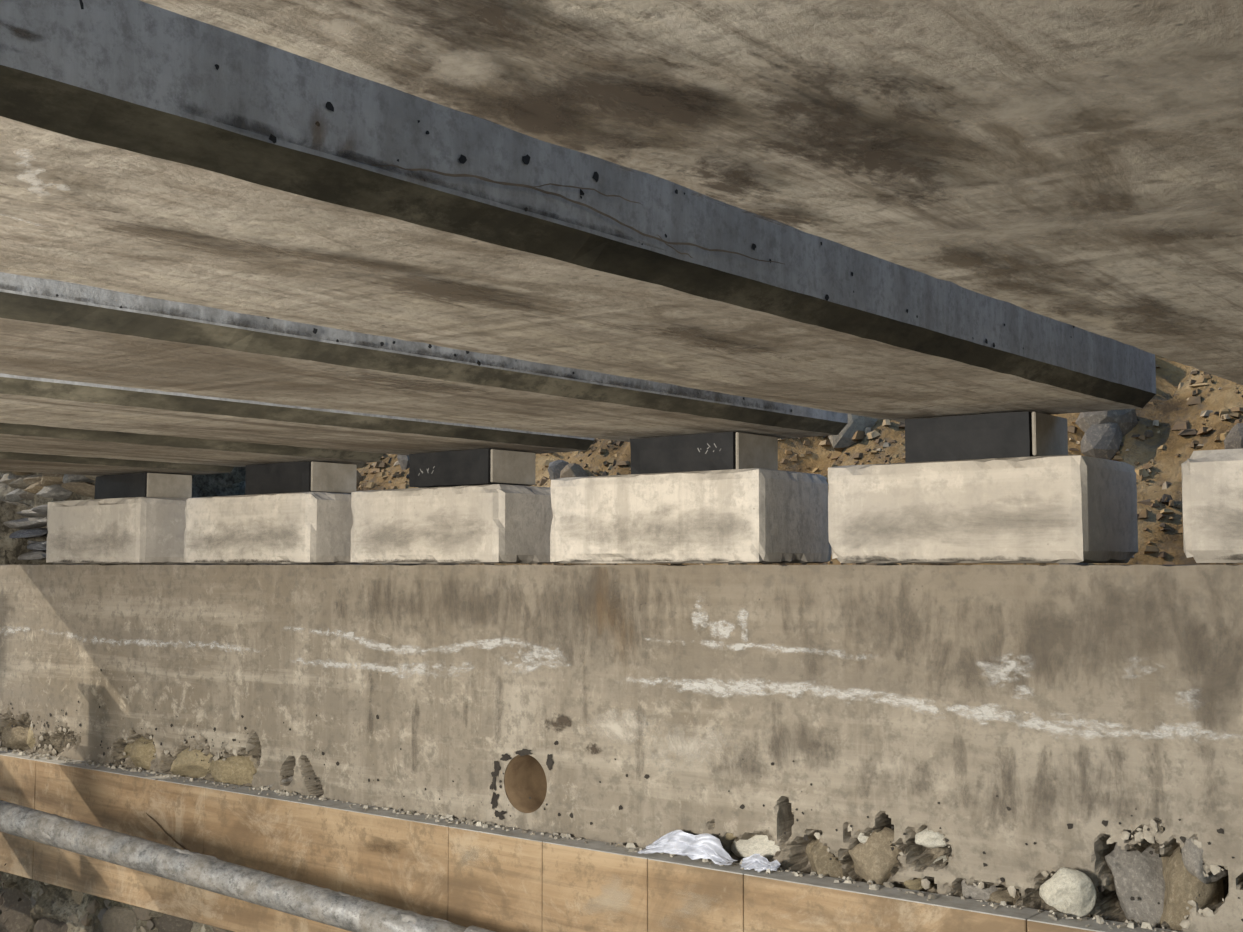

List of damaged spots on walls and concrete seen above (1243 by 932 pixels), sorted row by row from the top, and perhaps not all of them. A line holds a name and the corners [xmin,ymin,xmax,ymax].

crack [384,164,783,264]
water stain [104,225,545,318]
water stain [918,249,1204,335]
water stain [344,632,437,678]
water stain [449,639,556,670]
water stain [692,606,811,653]
spalling [0,703,81,756]
spalling [101,715,324,795]
water stain [680,679,869,698]
water stain [952,705,1009,724]
spalling [713,825,781,859]
spalling [805,808,1240,931]